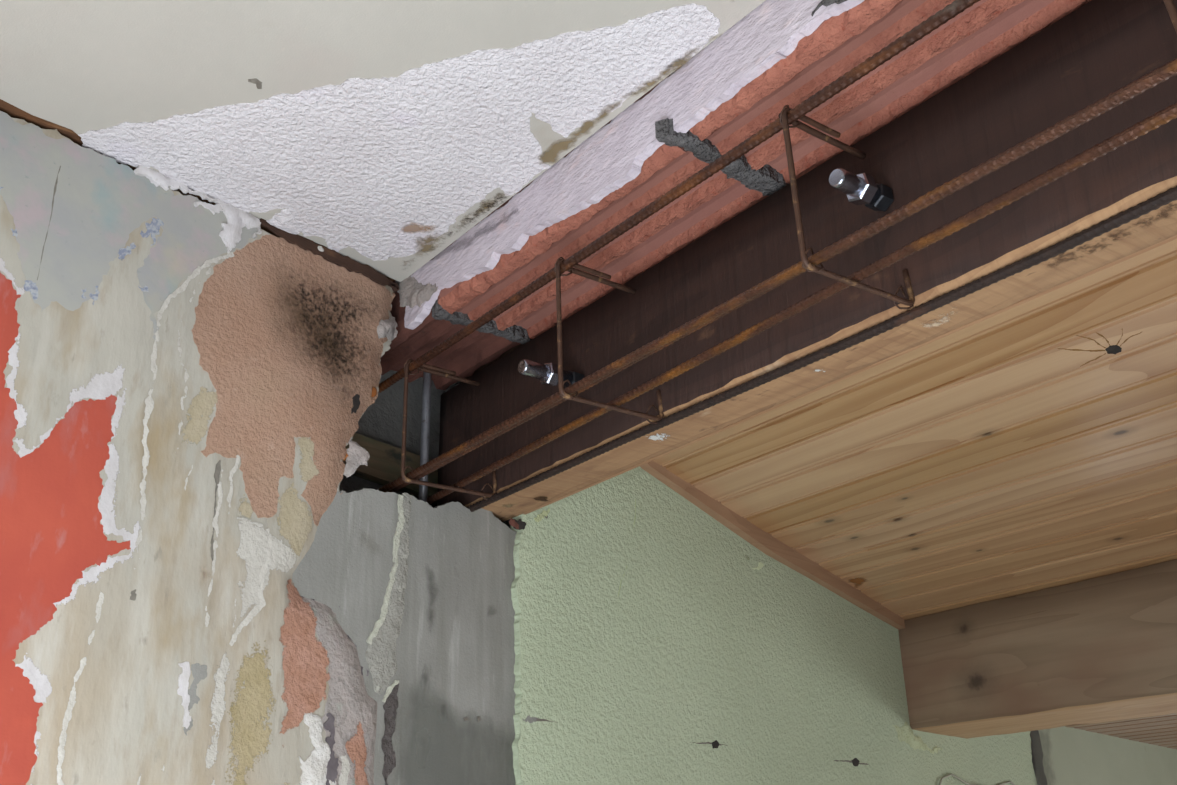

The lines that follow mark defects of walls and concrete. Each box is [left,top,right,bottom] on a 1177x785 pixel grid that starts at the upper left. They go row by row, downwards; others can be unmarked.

spalling [0,0,1177,526]
leakage [295,284,361,375]
leakage [351,394,360,414]
spalling [177,662,207,735]
spalling [279,579,377,785]